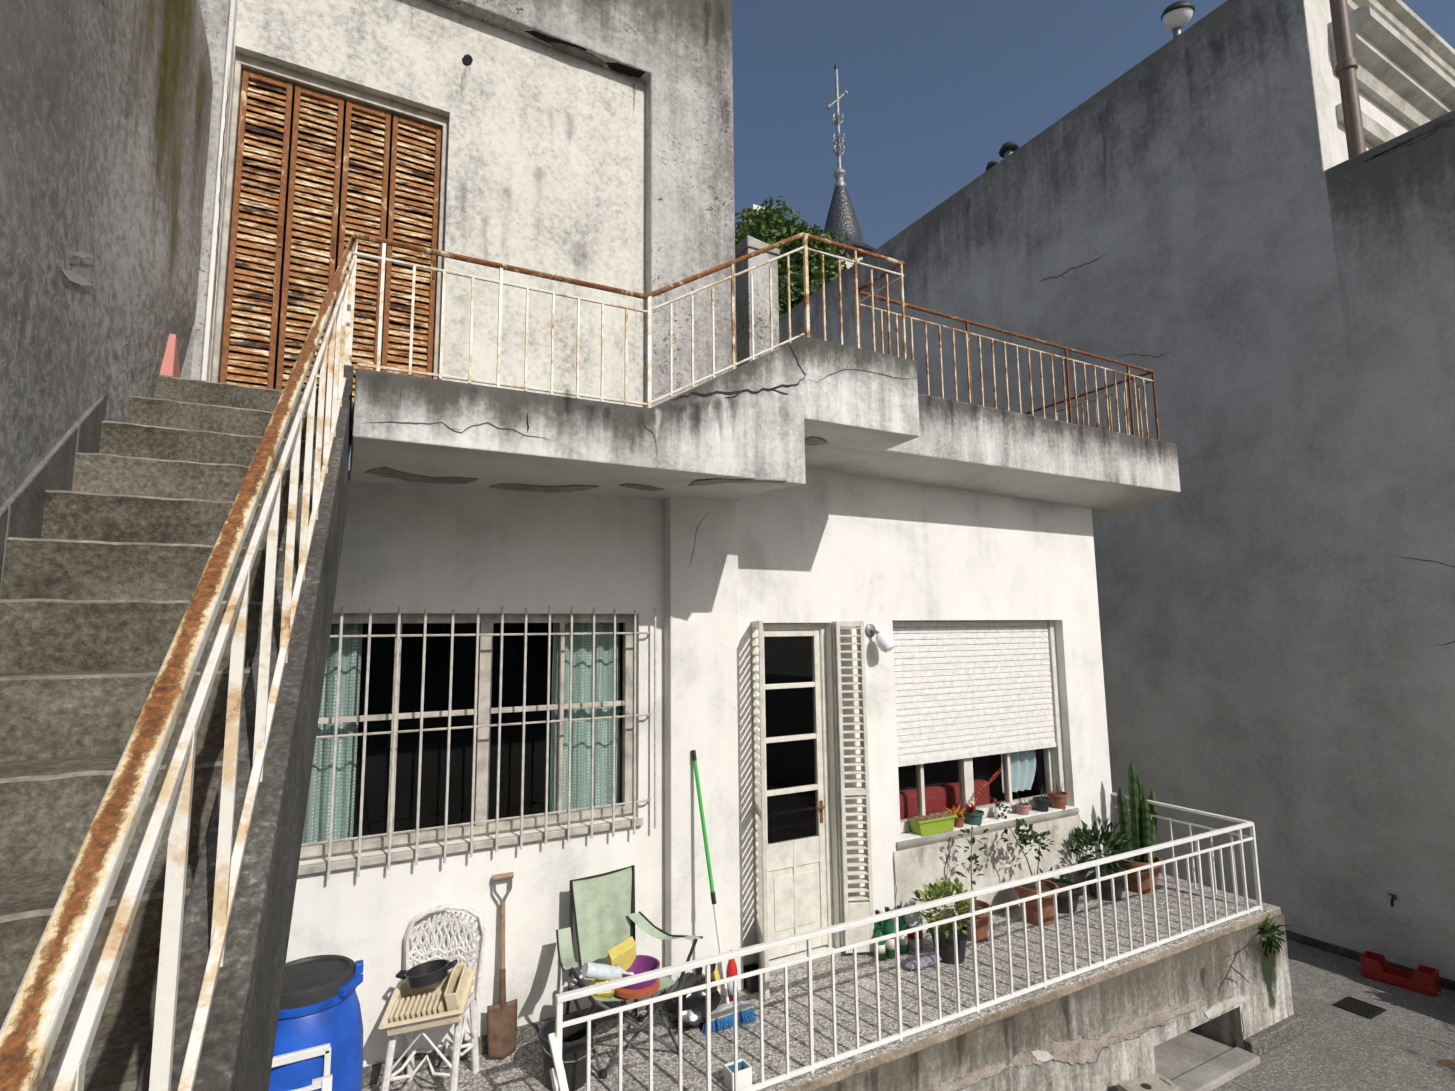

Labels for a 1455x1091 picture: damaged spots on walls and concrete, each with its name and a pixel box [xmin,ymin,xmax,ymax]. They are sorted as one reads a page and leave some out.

leakage [141,0,206,244]
crack [1036,254,1107,283]
crack [672,345,915,400]
crack [365,390,549,440]
peeling [365,467,599,492]
peeling [619,483,665,492]
peeling [688,478,787,487]
spalling [932,995,1251,1091]